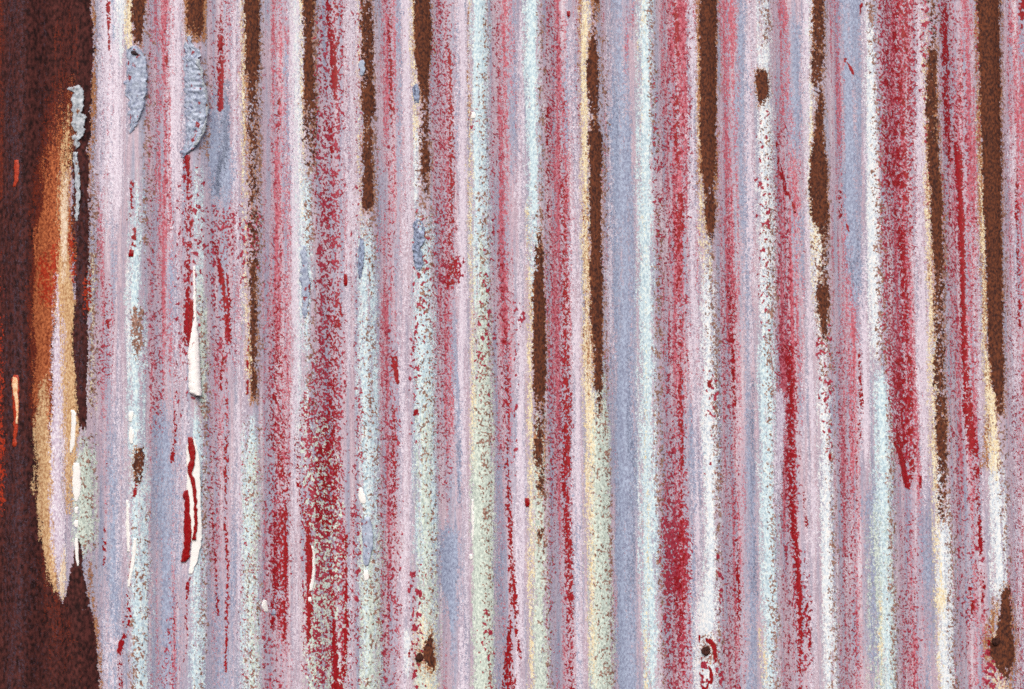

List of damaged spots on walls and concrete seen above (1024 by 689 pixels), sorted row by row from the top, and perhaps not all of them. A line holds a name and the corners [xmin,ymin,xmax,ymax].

corrosion [0,0,104,689]
peeling [123,0,526,689]
corrosion [354,0,387,688]
corrosion [408,0,445,689]
corrosion [524,1,556,689]
corrosion [575,0,618,689]
corrosion [693,0,728,688]
corrosion [754,64,782,689]
corrosion [805,0,837,392]
corrosion [919,0,960,689]
corrosion [972,0,1022,689]